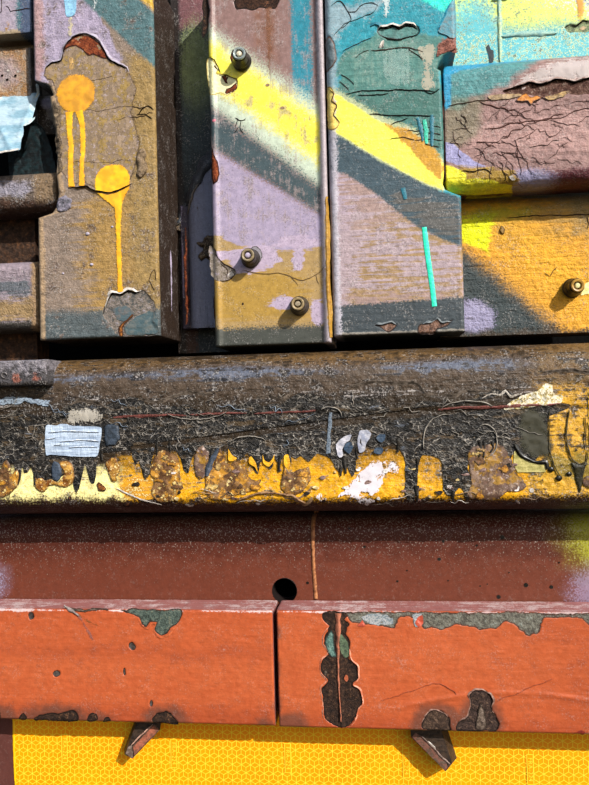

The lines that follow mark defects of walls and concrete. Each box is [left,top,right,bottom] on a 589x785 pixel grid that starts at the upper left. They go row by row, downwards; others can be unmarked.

crack [332,0,423,59]
peeling [488,60,589,105]
peeling [44,31,151,195]
crack [341,74,589,185]
peeling [103,287,159,337]
peeling [0,380,571,508]
peeling [121,608,182,639]
peeling [19,710,111,722]
peeling [150,700,178,725]
crack [379,683,456,702]
peeling [319,611,589,731]